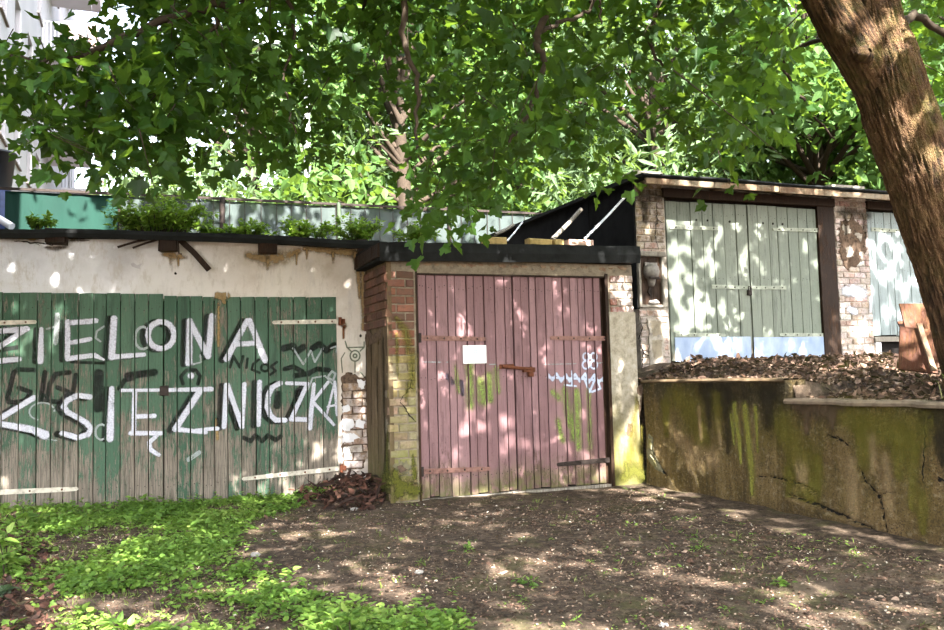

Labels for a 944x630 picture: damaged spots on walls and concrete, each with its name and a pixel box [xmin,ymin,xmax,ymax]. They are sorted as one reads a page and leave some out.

spalling [838,217,867,270]
leakage [245,247,409,479]
flaking render [340,372,368,471]
leakage [699,382,778,464]
leakage [791,404,845,435]
leakage [922,408,944,466]
crack [759,467,891,532]